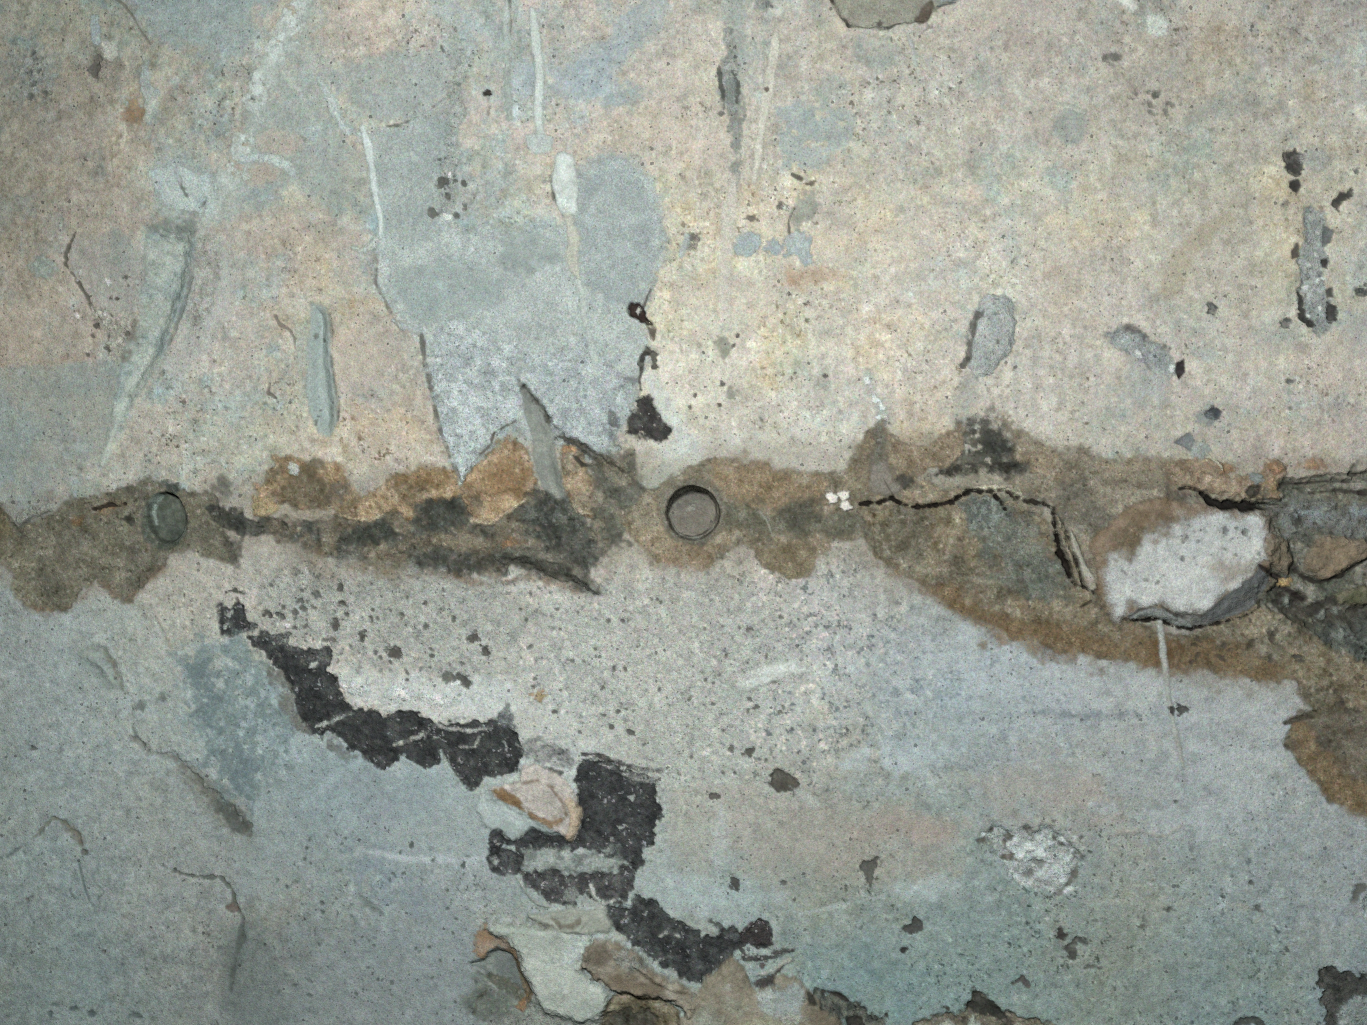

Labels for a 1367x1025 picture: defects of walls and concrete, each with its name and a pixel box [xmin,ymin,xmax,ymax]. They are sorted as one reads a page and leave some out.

spalling [351,98,700,485]
spalling [714,333,739,358]
leakage [0,372,1367,816]
crack [859,484,1367,631]
flaking render [1089,406,1367,661]
crack [1178,473,1367,512]
spalling [251,565,821,809]
leakage [217,588,794,994]
flaking render [490,764,582,841]
spalling [455,923,888,1025]
spalling [729,877,740,891]
spalling [901,916,923,953]